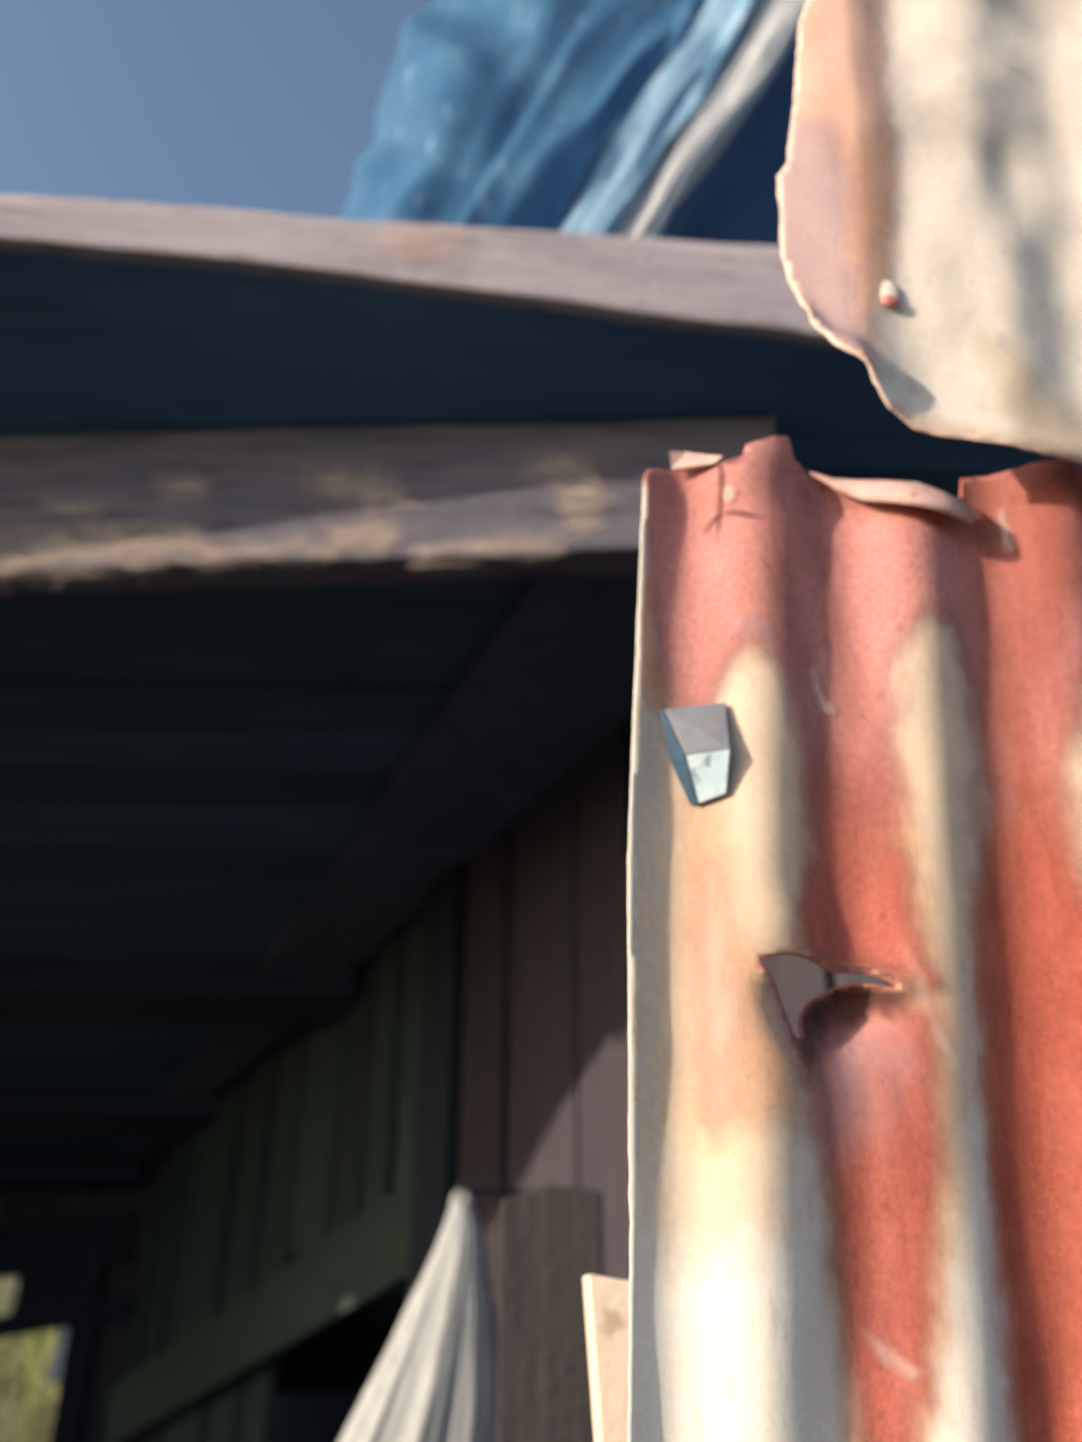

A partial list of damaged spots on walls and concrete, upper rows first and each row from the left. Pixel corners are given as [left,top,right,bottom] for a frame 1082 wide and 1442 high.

rust [782,0,891,365]
crack [704,456,756,532]
rust [641,436,1082,1442]